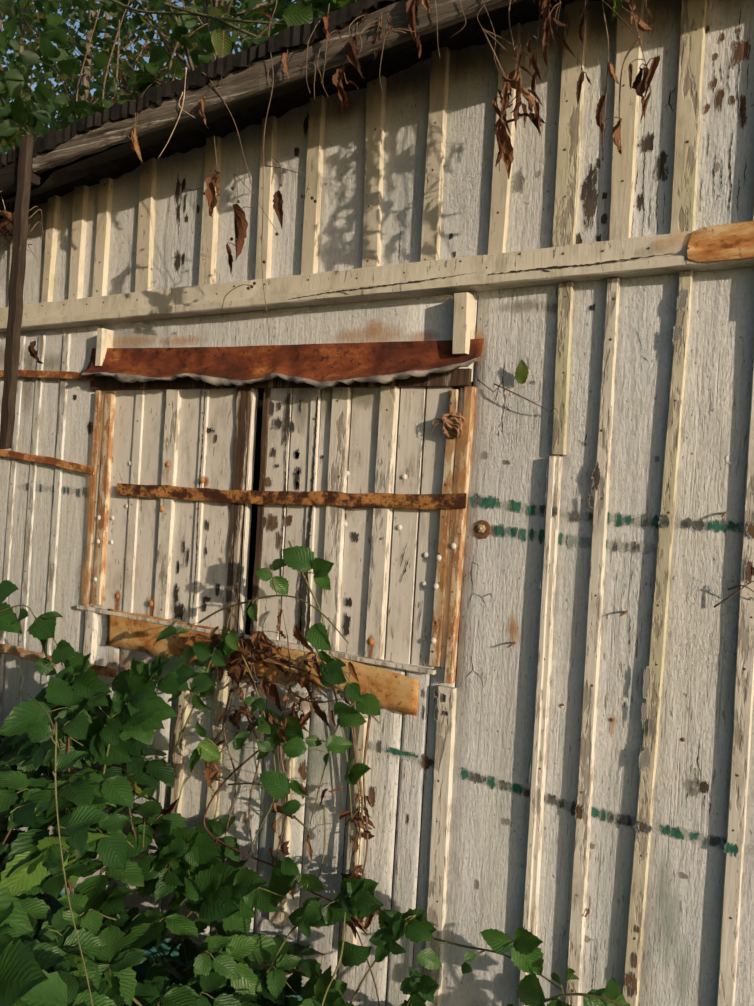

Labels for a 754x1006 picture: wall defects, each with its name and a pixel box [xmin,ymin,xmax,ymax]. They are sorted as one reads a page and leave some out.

peeling [705,25,752,67]
peeling [703,78,747,129]
peeling [637,131,669,183]
peeling [175,175,200,228]
peeling [576,158,608,244]
peeling [174,250,185,272]
peeling [264,391,302,490]
peeling [262,513,293,550]
peeling [468,461,601,544]
peeling [607,512,754,539]
peeling [172,541,220,621]
peeling [342,597,352,637]